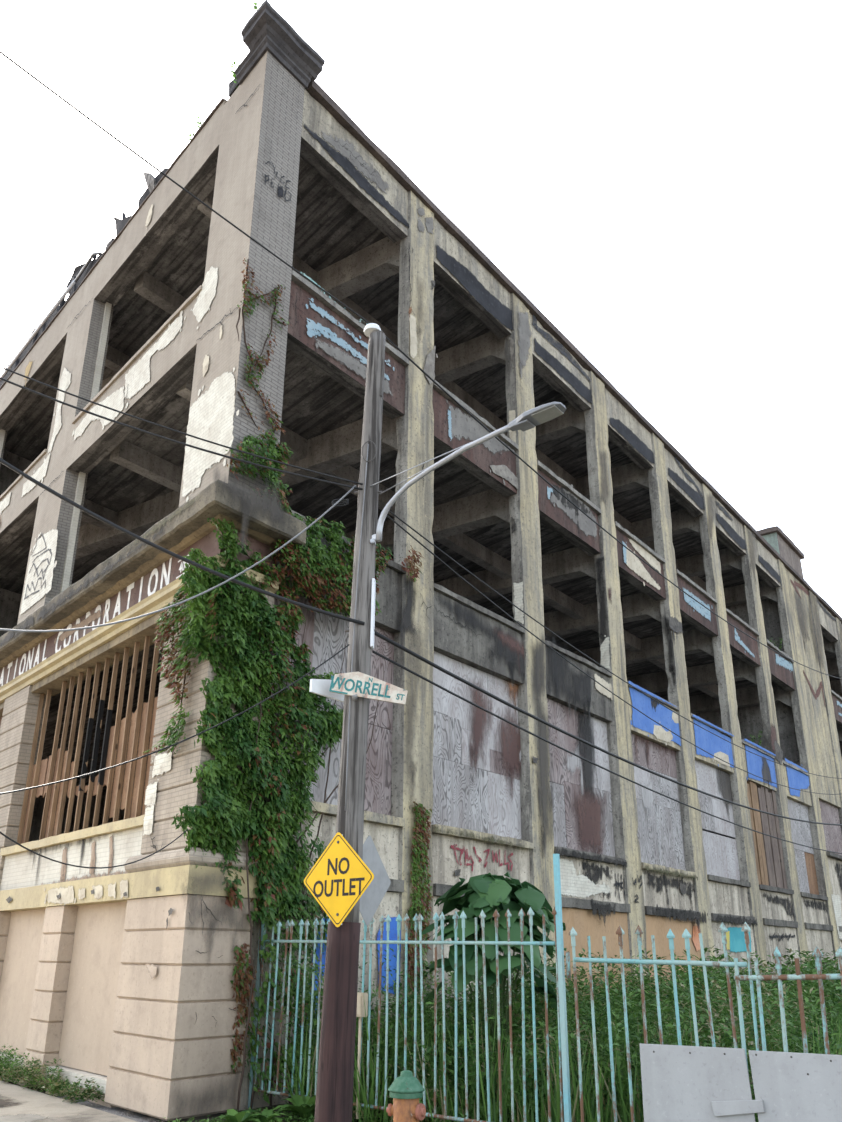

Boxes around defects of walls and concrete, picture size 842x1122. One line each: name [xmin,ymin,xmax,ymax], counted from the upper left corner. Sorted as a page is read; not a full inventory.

damp [304,124,592,403]
peeling [301,272,368,364]
peeling [0,266,218,515]
peeling [182,355,239,502]
peeling [20,529,58,615]
damp [439,596,628,925]
peeling [594,635,612,700]
peeling [628,681,681,746]
peeling [693,714,810,797]
peeling [775,653,793,672]